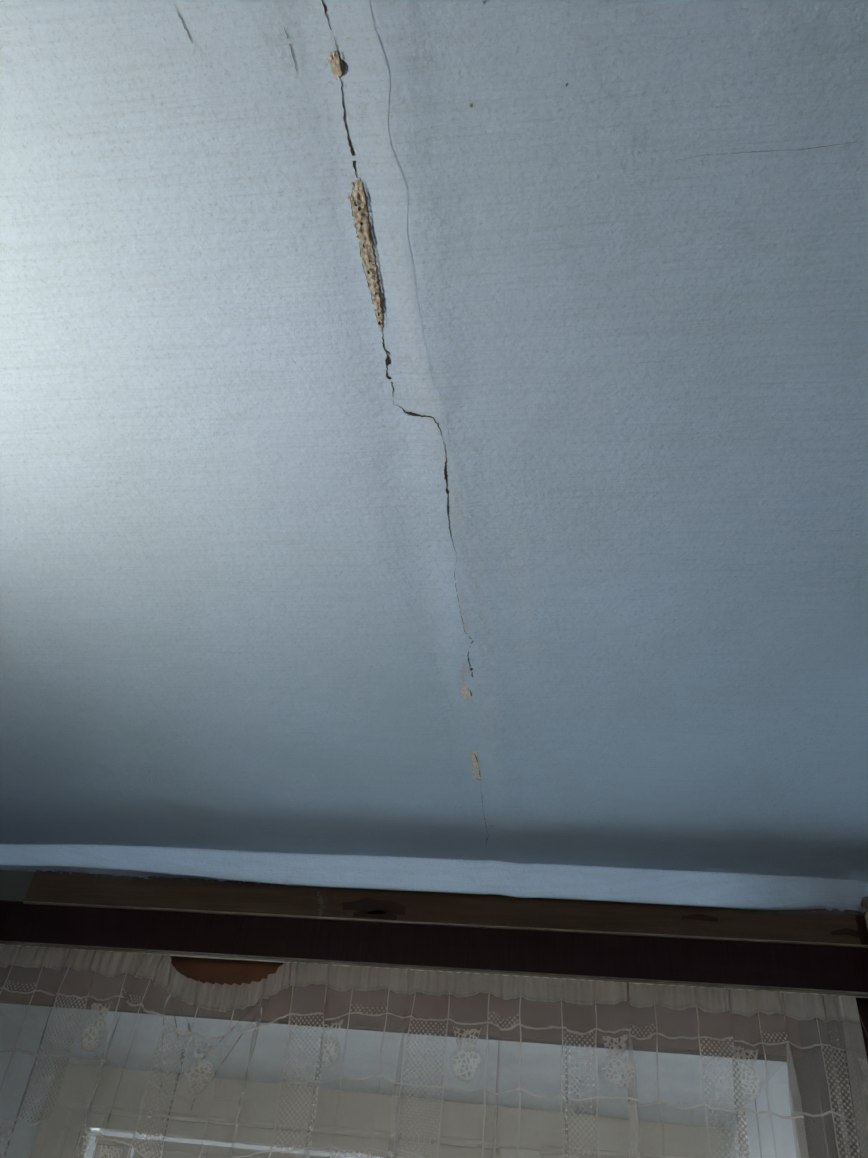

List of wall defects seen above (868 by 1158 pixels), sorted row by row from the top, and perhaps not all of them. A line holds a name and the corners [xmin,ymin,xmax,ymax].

crack [340,79,357,177]
flaking render [348,178,384,331]
crack [382,333,474,677]